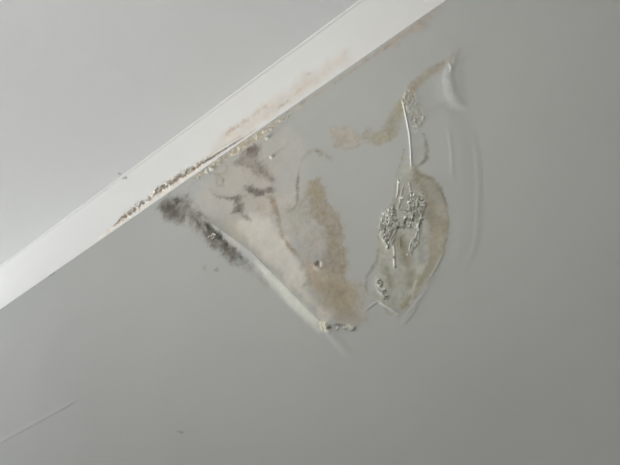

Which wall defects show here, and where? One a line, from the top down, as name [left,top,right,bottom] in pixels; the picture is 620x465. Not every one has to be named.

peeling [400,88,427,154]
peeling [98,157,213,240]
damp [153,4,461,335]
peeling [377,181,429,267]